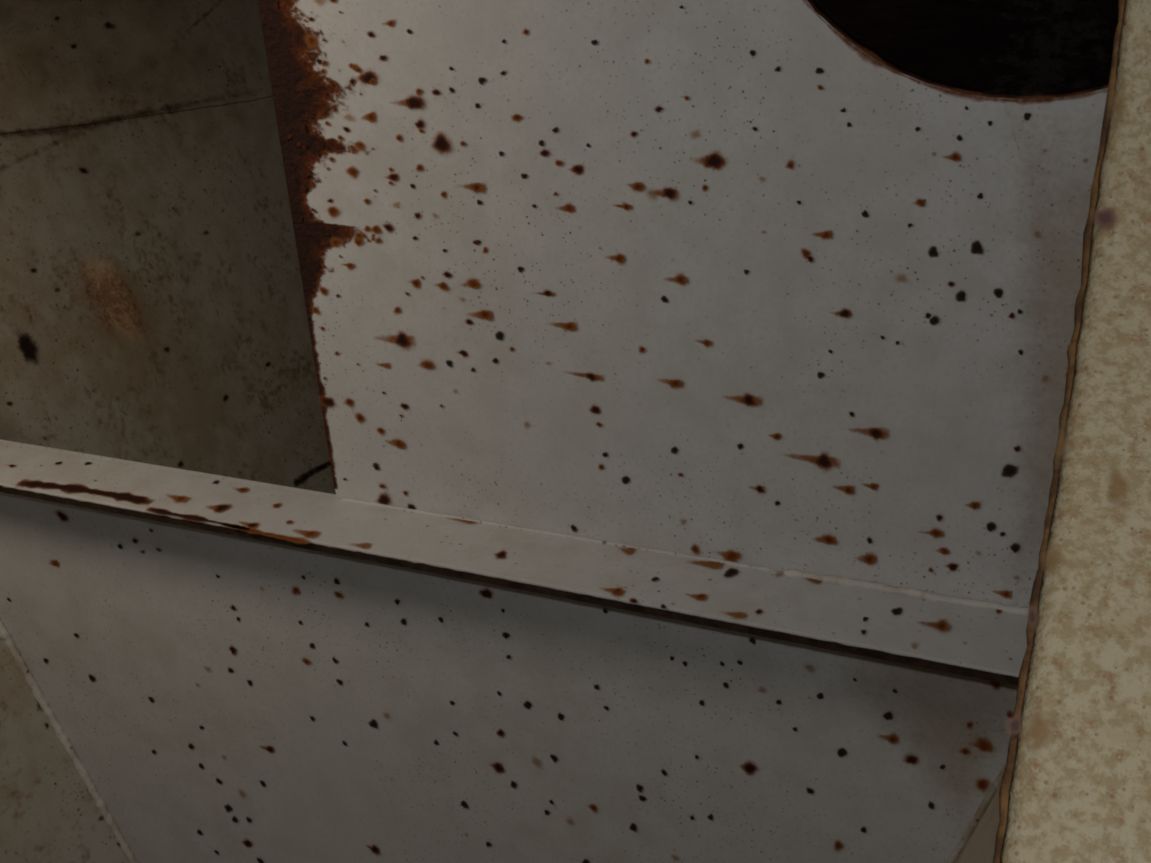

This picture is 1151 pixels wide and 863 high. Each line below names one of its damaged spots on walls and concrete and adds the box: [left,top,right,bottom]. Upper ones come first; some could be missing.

rust [331,224,393,247]
rust [377,484,390,505]
rust [16,479,320,543]
rust [816,535,836,544]
rust [925,515,958,571]
rust [691,545,741,569]
rust [858,553,877,565]
rust [604,587,637,603]
rust [994,591,1012,613]
rust [920,620,950,631]
rust [960,722,993,755]
rust [742,762,757,774]